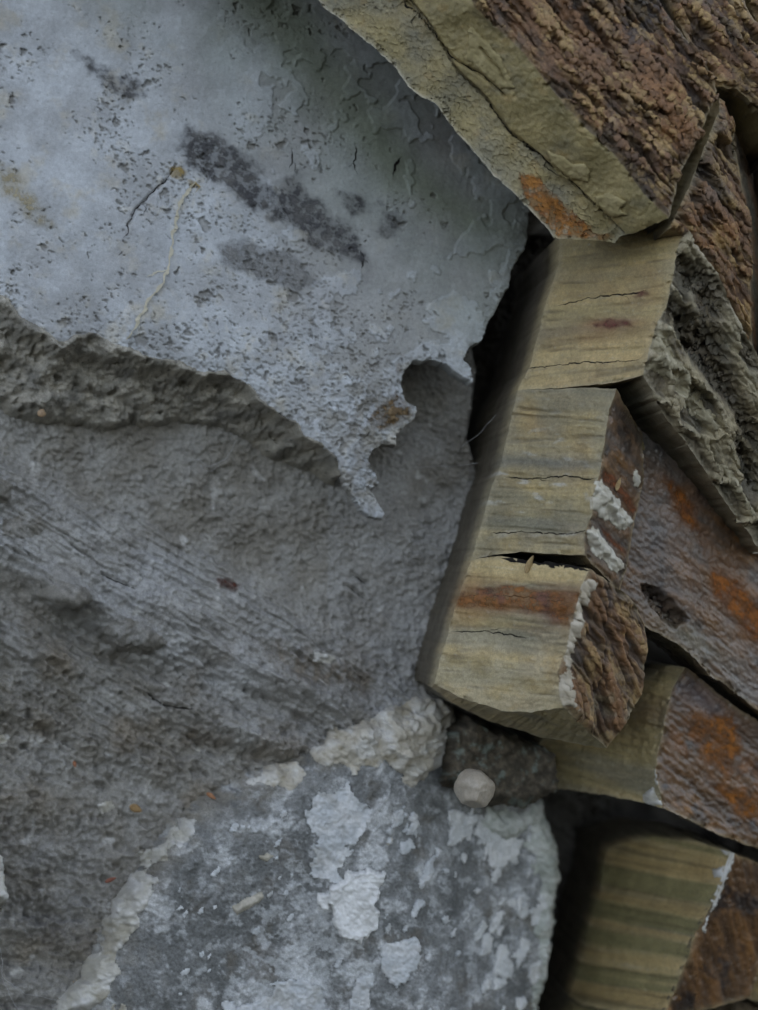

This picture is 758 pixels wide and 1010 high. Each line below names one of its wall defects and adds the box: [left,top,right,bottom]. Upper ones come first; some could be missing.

crack [123,166,201,339]
spalling [0,295,341,486]
peeling [221,977,330,1010]
peeling [305,781,533,1010]
peeling [473,894,548,994]